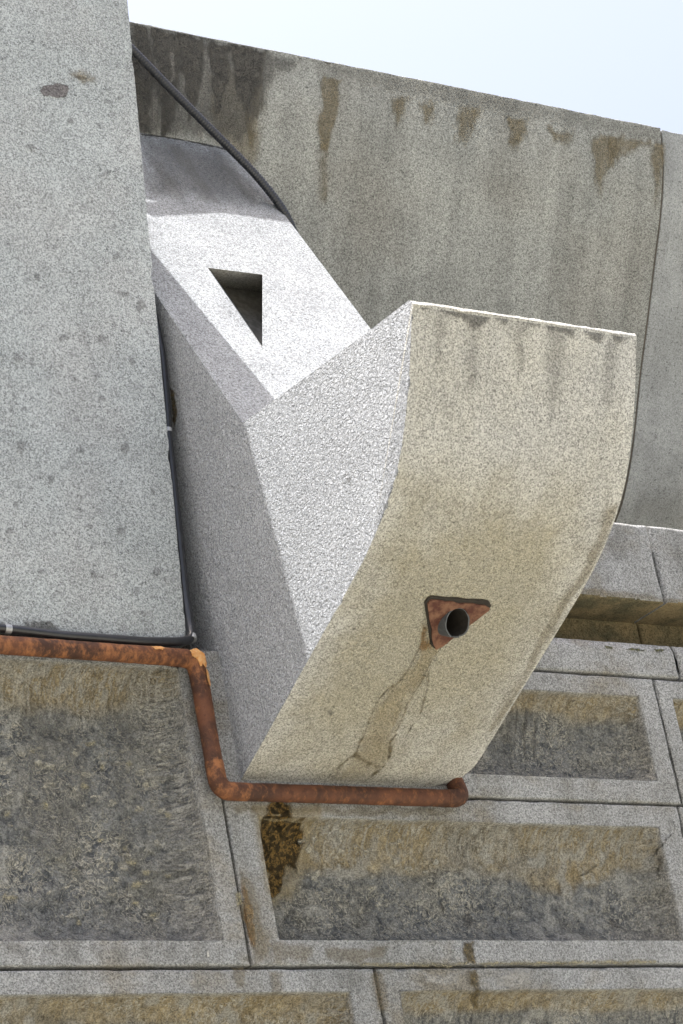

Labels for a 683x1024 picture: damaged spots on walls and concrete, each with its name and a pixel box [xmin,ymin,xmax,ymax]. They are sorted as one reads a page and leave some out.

damp [131,23,266,145]
damp [319,76,339,149]
damp [592,137,642,184]
damp [652,144,664,183]